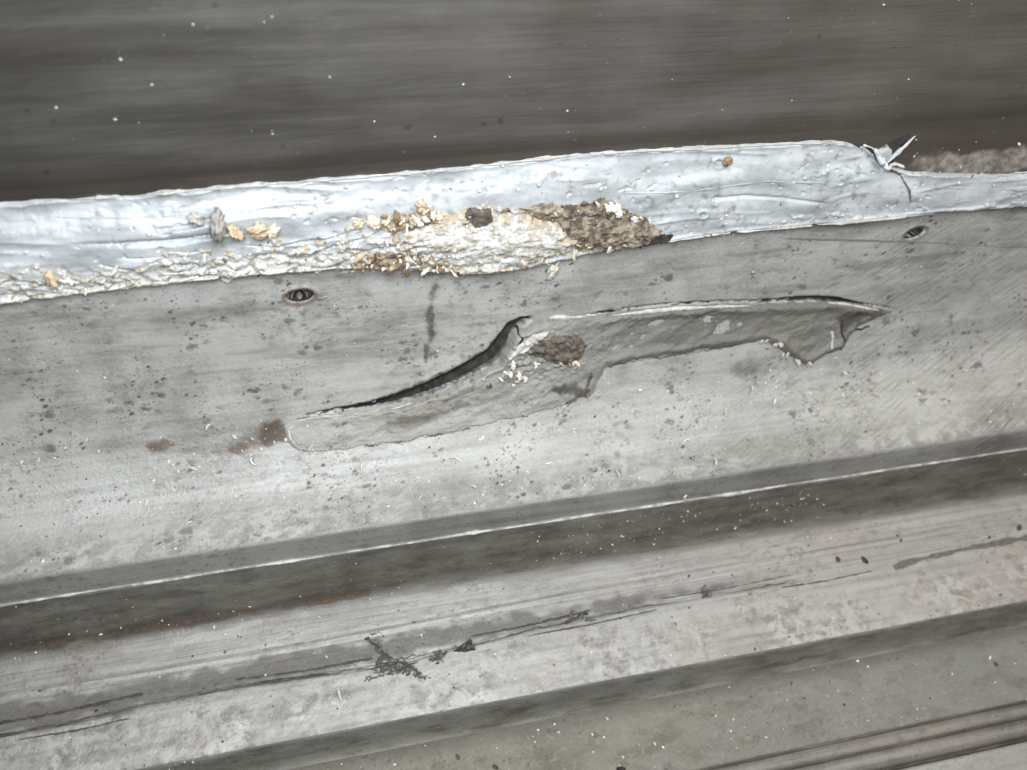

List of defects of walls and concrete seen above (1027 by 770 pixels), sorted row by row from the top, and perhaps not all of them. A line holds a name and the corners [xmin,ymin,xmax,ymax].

spalling [0,207,469,302]
spalling [458,197,663,262]
peeling [283,299,890,452]